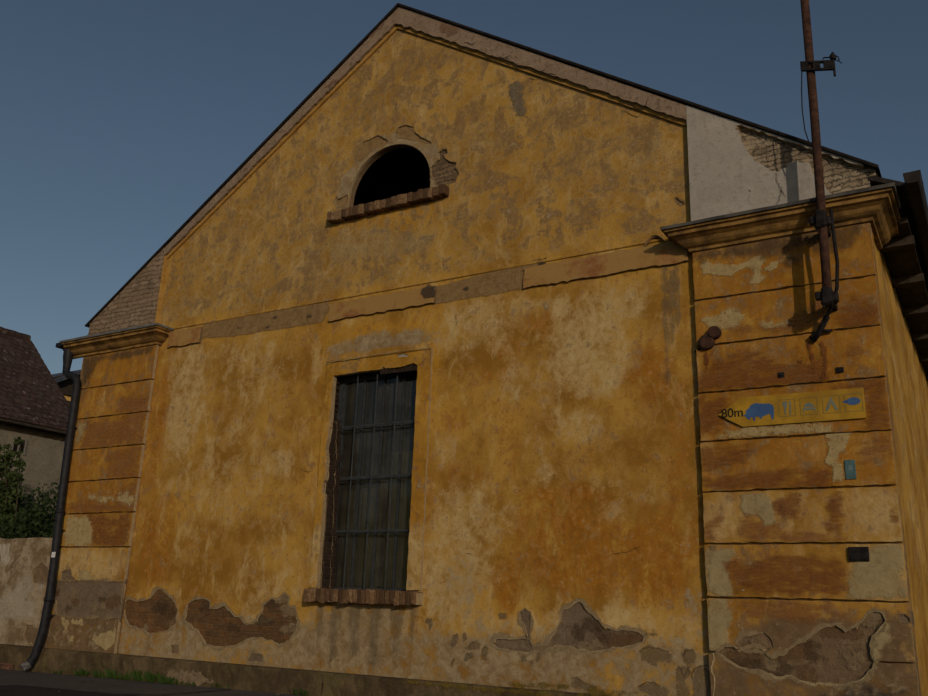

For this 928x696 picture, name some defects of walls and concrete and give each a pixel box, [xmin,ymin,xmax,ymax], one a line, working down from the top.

spalling [396,125,459,186]
spalling [736,124,876,194]
peeling [700,252,778,284]
peeling [700,398,851,482]
flaking render [320,420,342,589]
peeling [739,493,842,541]
spalling [32,562,301,665]
spalling [450,598,711,696]
spalling [706,544,915,691]